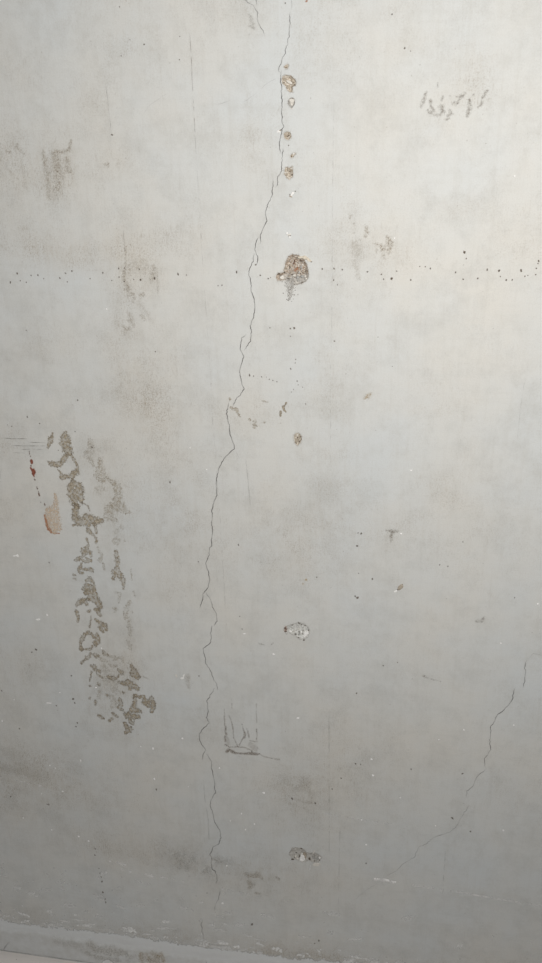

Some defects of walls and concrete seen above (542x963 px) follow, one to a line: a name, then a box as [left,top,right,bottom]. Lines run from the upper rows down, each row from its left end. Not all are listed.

spalling [268,254,312,300]
peeling [47,431,156,734]